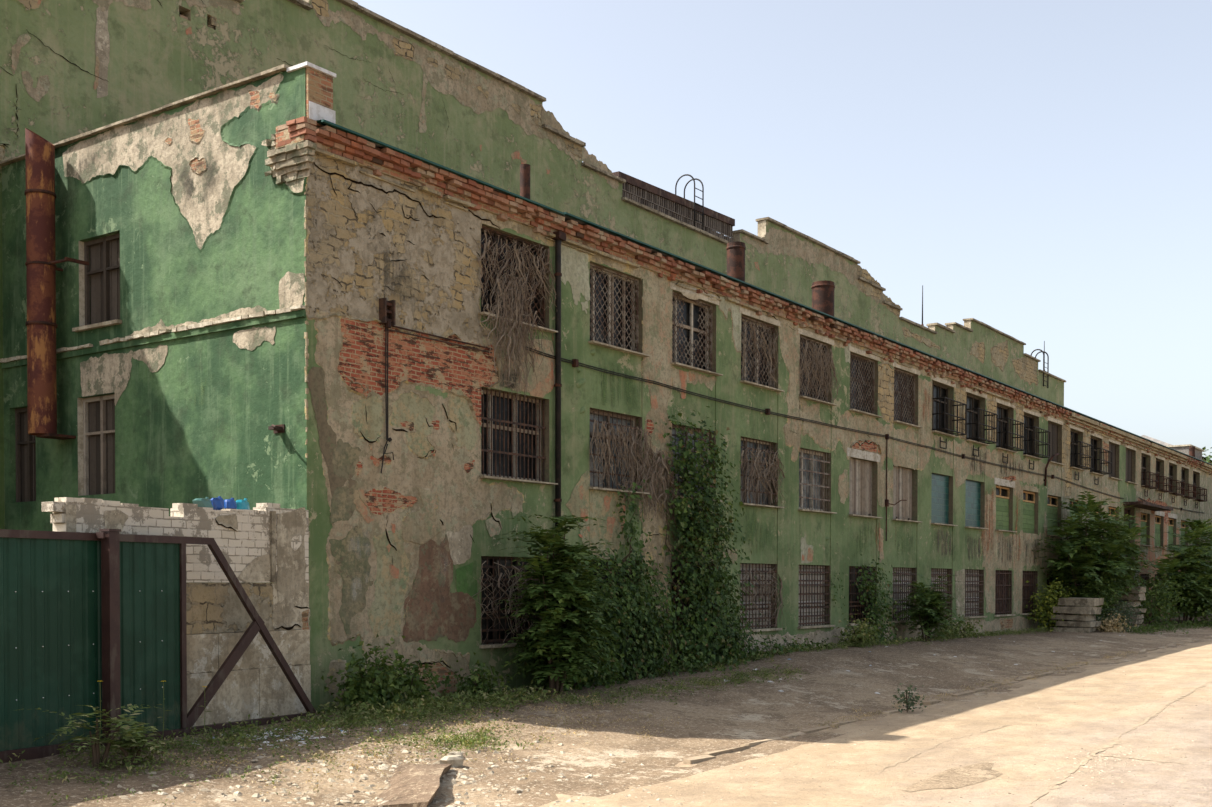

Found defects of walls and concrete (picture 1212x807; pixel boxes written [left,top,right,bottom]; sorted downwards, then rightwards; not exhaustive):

crack [26,29,107,81]
flaking render [62,72,285,253]
flaking render [179,0,241,35]
flaking render [310,0,619,189]
crack [360,403,477,458]
flaking render [80,153,1212,700]